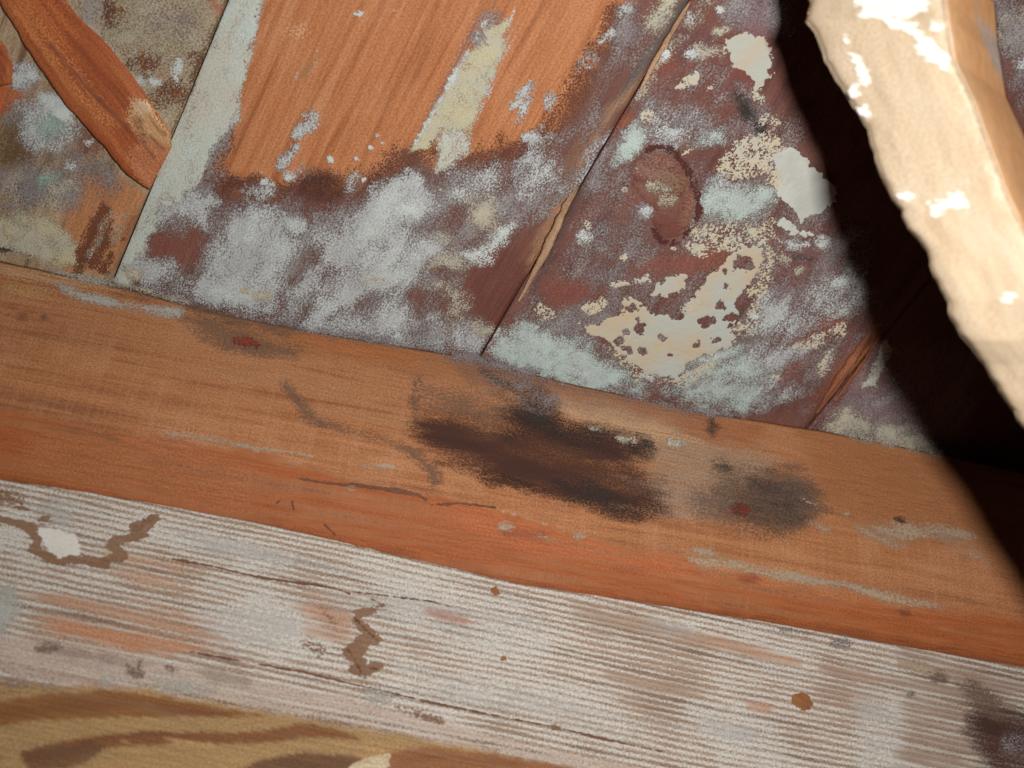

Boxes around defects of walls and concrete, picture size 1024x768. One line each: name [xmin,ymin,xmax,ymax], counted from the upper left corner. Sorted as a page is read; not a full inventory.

water stain [0,0,883,522]
peeling [533,302,556,321]
peeling [578,32,837,391]
water stain [698,461,831,534]